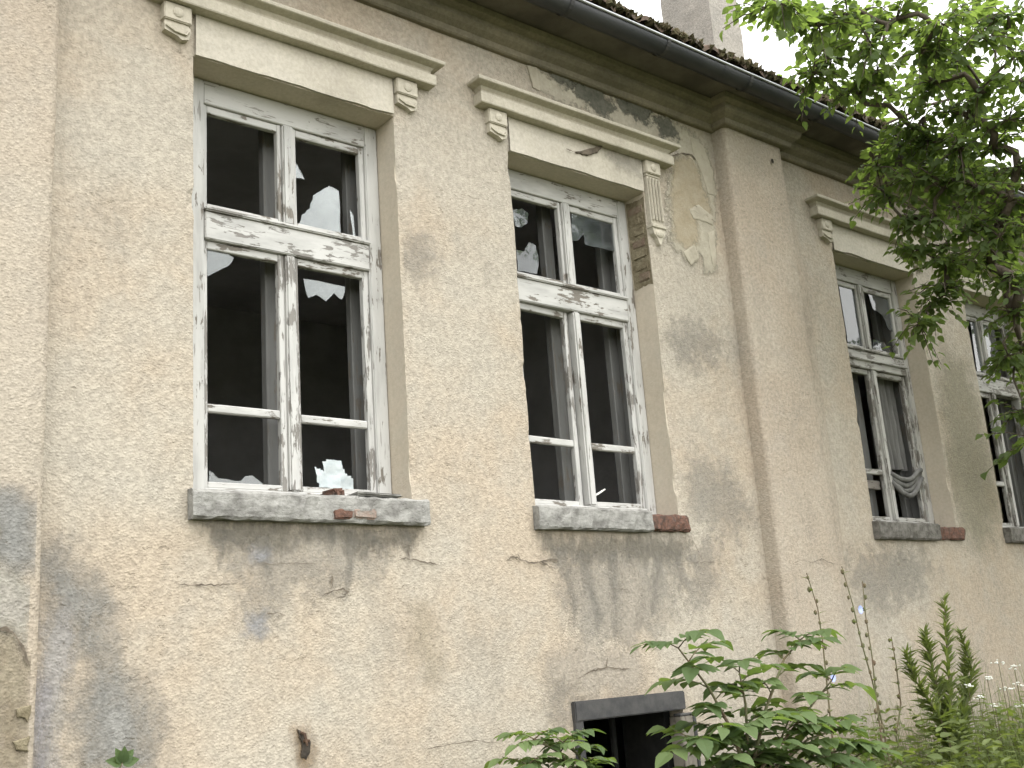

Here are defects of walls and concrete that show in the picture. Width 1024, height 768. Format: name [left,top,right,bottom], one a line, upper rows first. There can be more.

peeling [526,65,718,274]
leakage [208,521,416,560]
crack [401,546,439,565]
crack [507,553,558,568]
crack [263,562,349,598]
leakage [545,537,683,641]
crack [580,658,629,678]
corrosion [296,729,311,760]